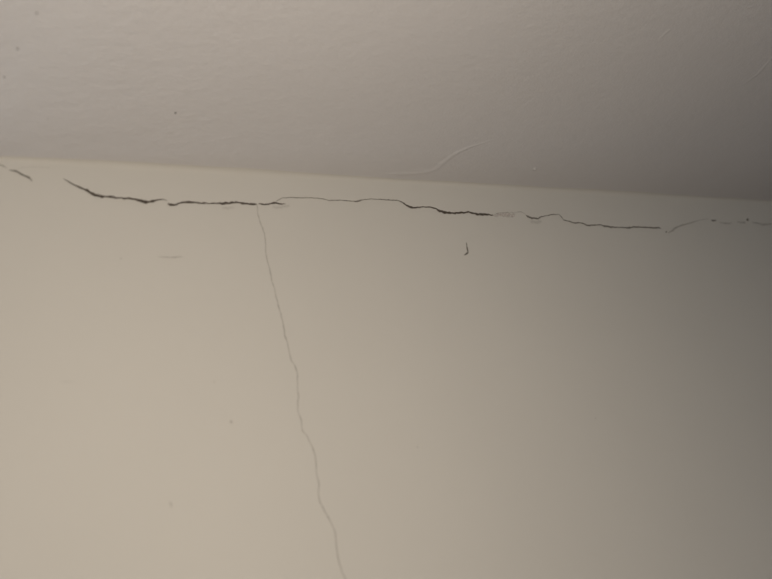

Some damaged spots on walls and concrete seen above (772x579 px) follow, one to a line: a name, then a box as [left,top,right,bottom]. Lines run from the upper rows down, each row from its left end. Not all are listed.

crack [66,180,493,216]
crack [527,214,667,233]